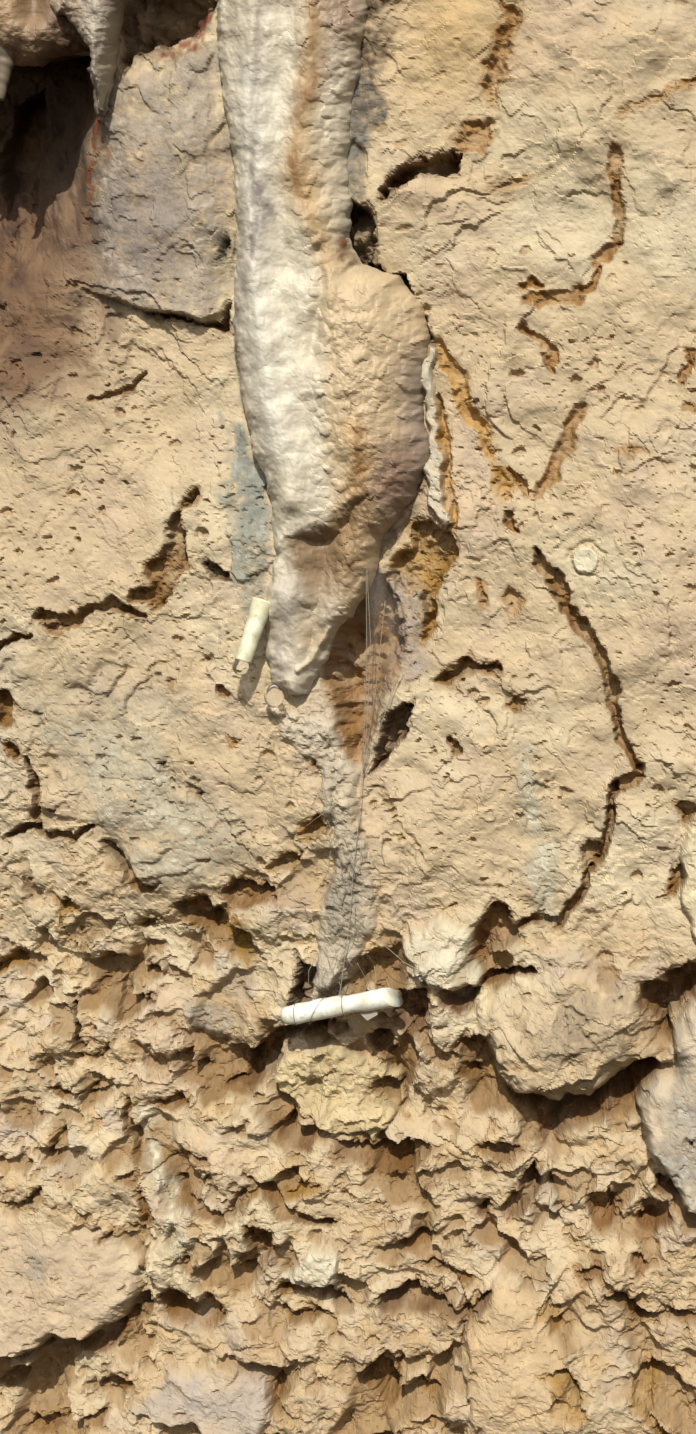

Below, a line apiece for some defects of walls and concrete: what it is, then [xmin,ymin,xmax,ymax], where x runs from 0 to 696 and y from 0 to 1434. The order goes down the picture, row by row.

leakage [346,0,387,195]
crack [132,297,235,339]
crack [350,0,696,933]
crack [0,483,235,651]
crack [0,686,158,895]
spalling [126,810,333,934]
spalling [0,958,163,1216]
spalling [146,895,680,1224]
spalling [0,1250,230,1434]
spalling [221,1101,497,1359]
spalling [352,1345,446,1434]
spalling [567,1168,696,1332]